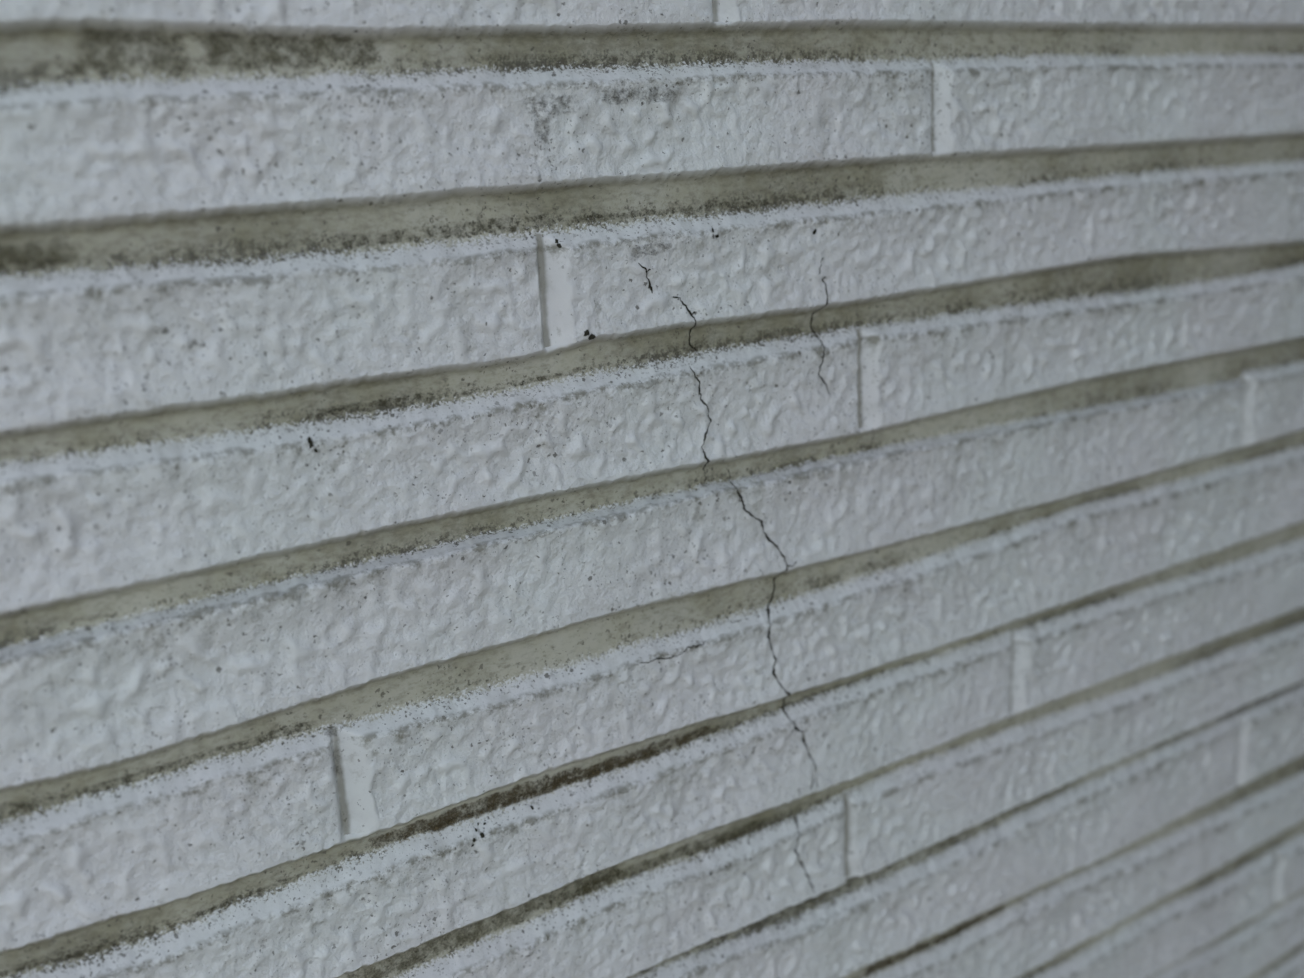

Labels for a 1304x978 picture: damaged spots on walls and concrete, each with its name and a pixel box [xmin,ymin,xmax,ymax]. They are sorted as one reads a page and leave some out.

crack [636,263,818,890]
crack [810,257,830,395]